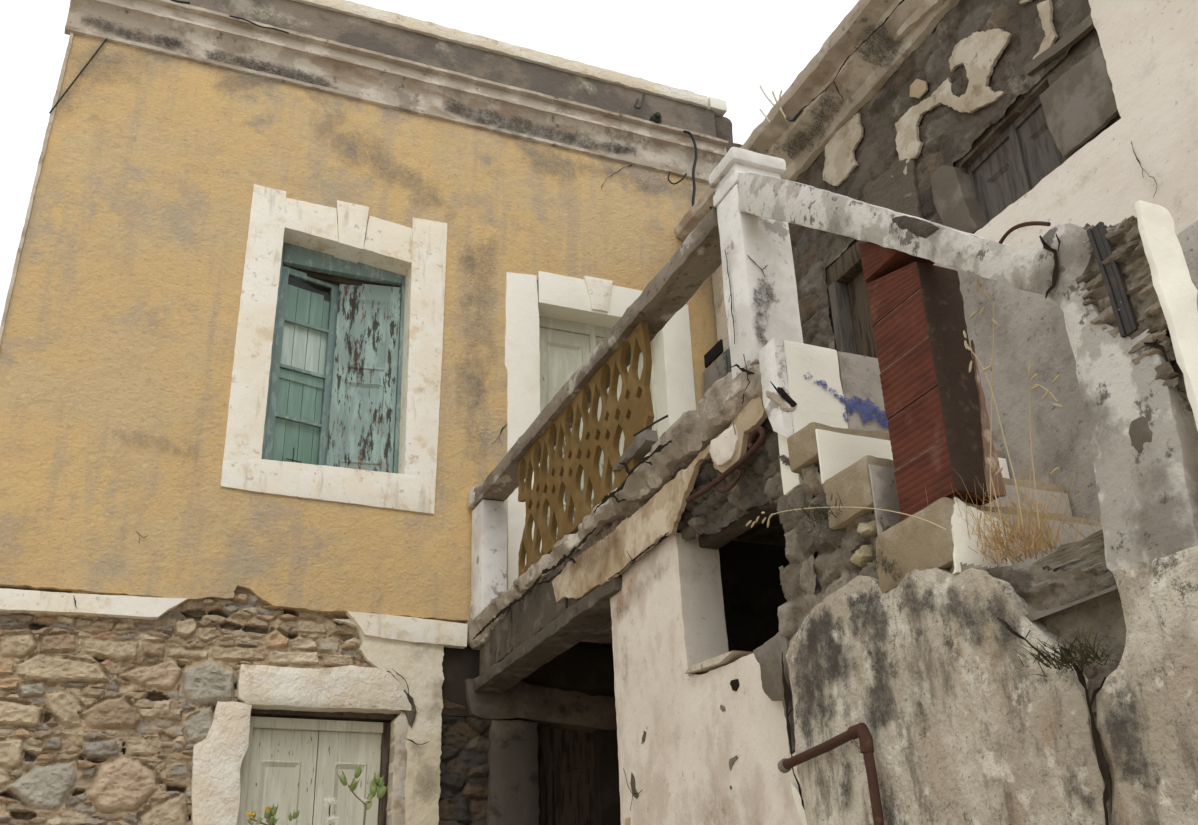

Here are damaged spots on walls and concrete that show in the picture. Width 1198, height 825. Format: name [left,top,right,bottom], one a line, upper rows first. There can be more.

damp [446,100,636,172]
crack [802,0,905,109]
flaking render [795,0,1091,238]
flaking render [788,223,855,350]
peeling [1129,416,1153,454]
crack [473,440,672,640]
flaking render [0,587,375,825]
crack [782,652,806,816]
damp [793,592,893,746]
damp [840,750,851,811]
damp [893,583,1016,655]
crack [997,617,1110,825]